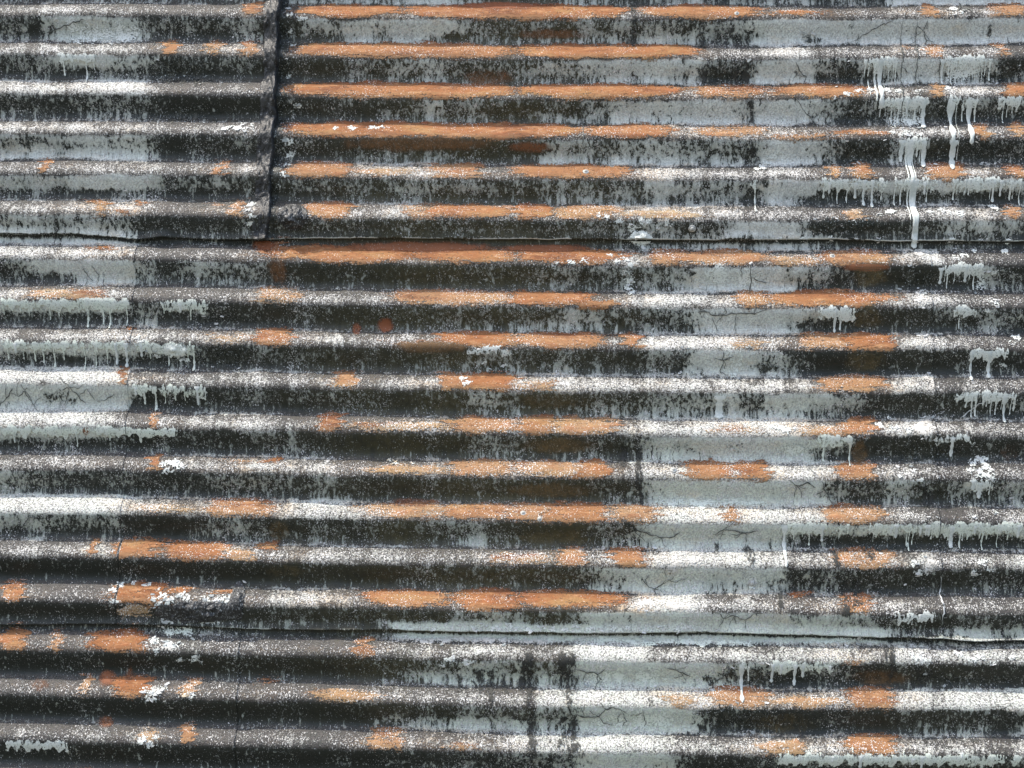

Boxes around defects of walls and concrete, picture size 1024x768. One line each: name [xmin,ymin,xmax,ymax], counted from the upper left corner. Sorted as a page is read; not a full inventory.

corrosion [288,2,832,64]
corrosion [279,78,884,104]
corrosion [276,118,892,182]
corrosion [399,200,717,224]
corrosion [247,236,909,354]
crack [2,377,114,409]
corrosion [312,410,631,481]
corrosion [342,497,668,527]
corrosion [83,535,280,563]
corrosion [484,542,652,569]
corrosion [350,584,647,616]
corrosion [657,684,903,714]